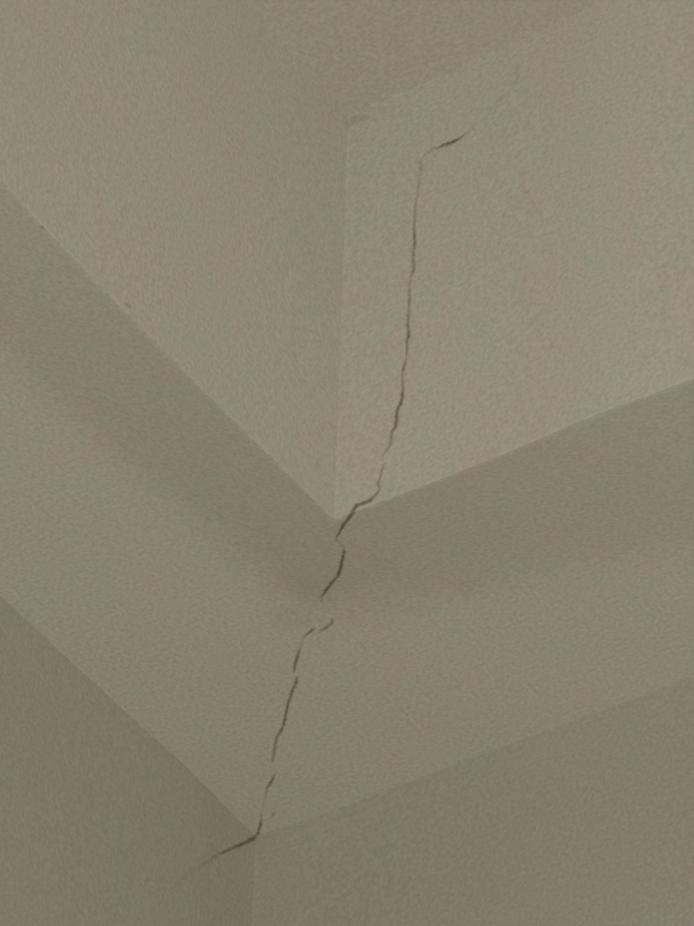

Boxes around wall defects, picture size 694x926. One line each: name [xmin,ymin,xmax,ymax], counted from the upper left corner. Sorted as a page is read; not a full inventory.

crack [323,498,372,595]
crack [225,823,261,852]